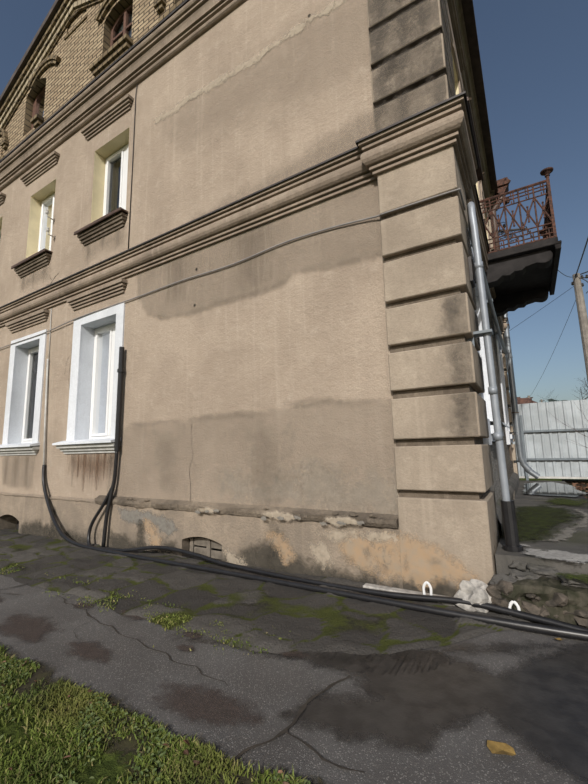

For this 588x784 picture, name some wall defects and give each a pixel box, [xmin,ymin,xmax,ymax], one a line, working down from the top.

flaking render [261,511,301,521]
flaking render [143,519,160,546]
flaking render [223,549,247,566]
flaking render [267,534,295,565]
flaking render [310,517,477,591]
crack [229,675,364,773]
water stain [269,643,588,782]